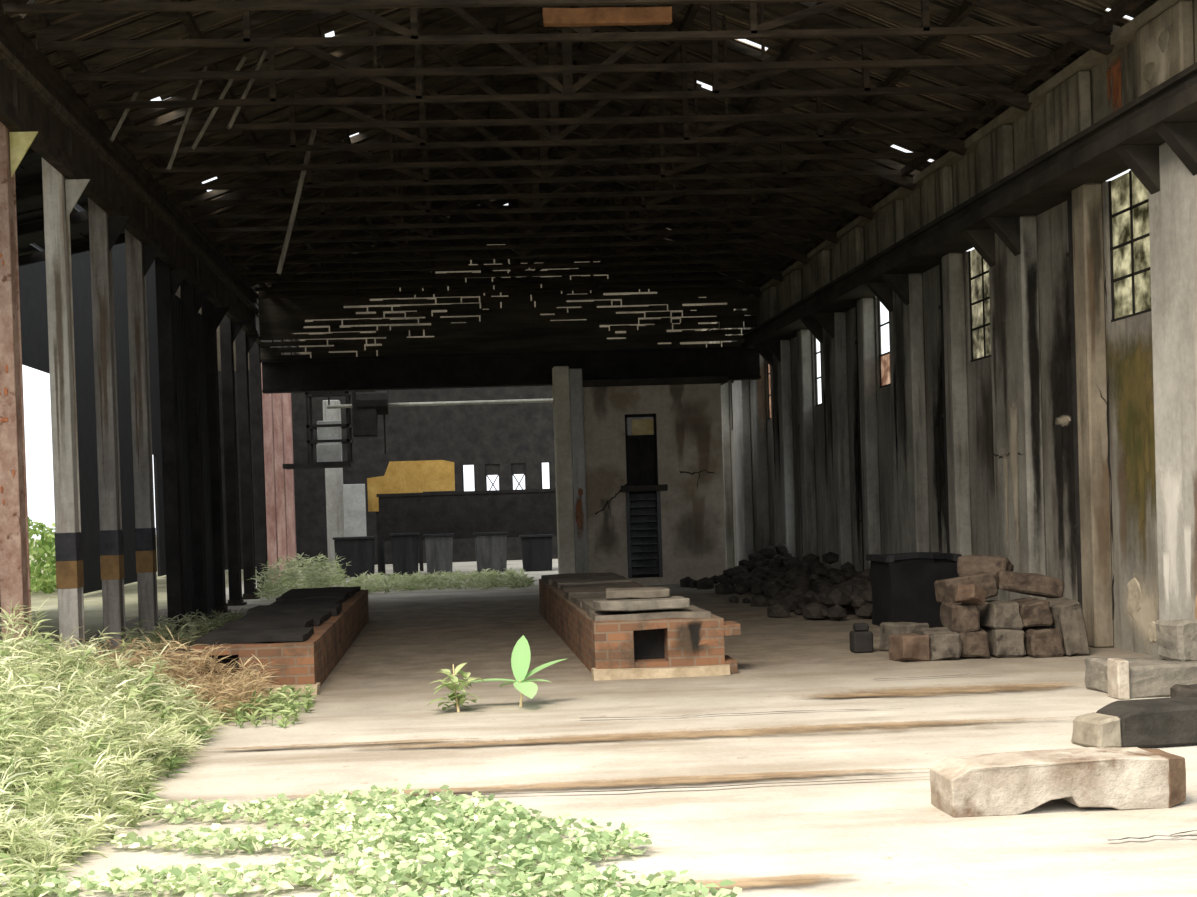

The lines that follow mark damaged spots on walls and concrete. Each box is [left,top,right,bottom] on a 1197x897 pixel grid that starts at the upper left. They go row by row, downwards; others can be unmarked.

leakage [982,260,1019,542]
leakage [1031,338,1076,552]
leakage [1098,398,1197,604]